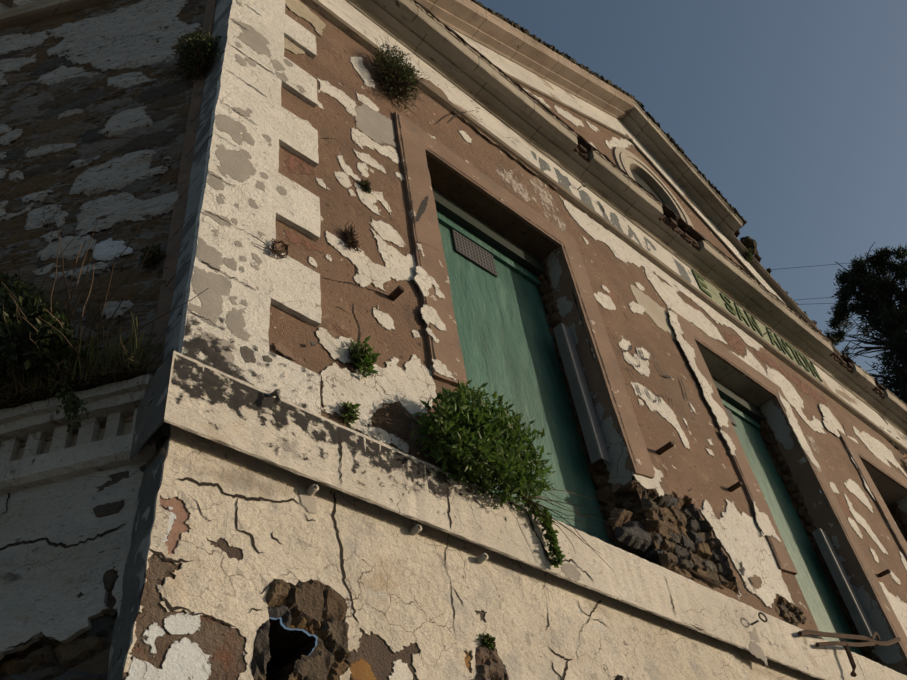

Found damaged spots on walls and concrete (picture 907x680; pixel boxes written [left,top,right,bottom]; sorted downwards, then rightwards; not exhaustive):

peeling [0,0,202,89]
peeling [0,149,178,281]
peeling [308,56,446,343]
damp [168,310,496,513]
peeling [310,327,457,454]
peeling [547,184,907,563]
crack [0,524,124,550]
crack [149,548,193,563]
crack [163,432,359,627]
spalling [121,491,419,680]
crack [525,511,609,680]
spalling [589,391,807,627]